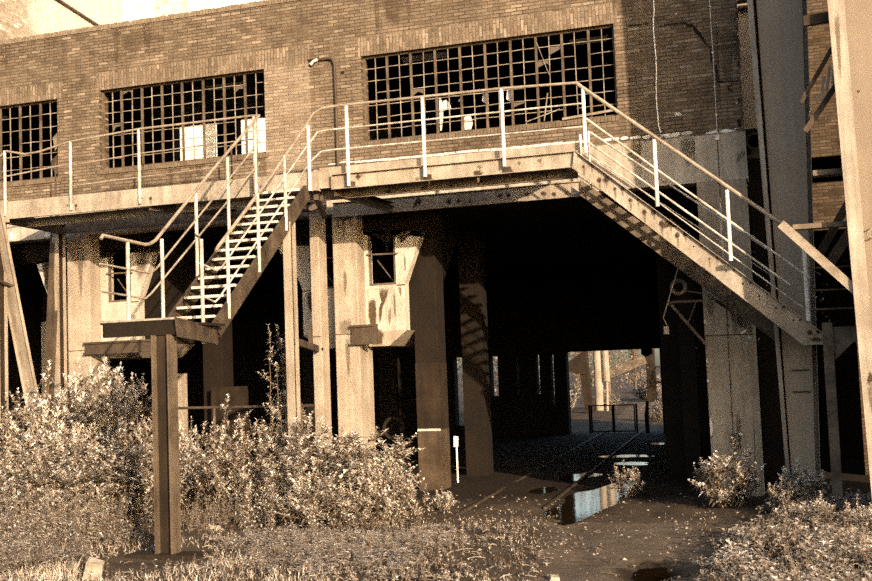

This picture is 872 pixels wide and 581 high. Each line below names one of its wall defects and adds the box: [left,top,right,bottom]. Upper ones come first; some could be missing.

crack [626,22,739,92]